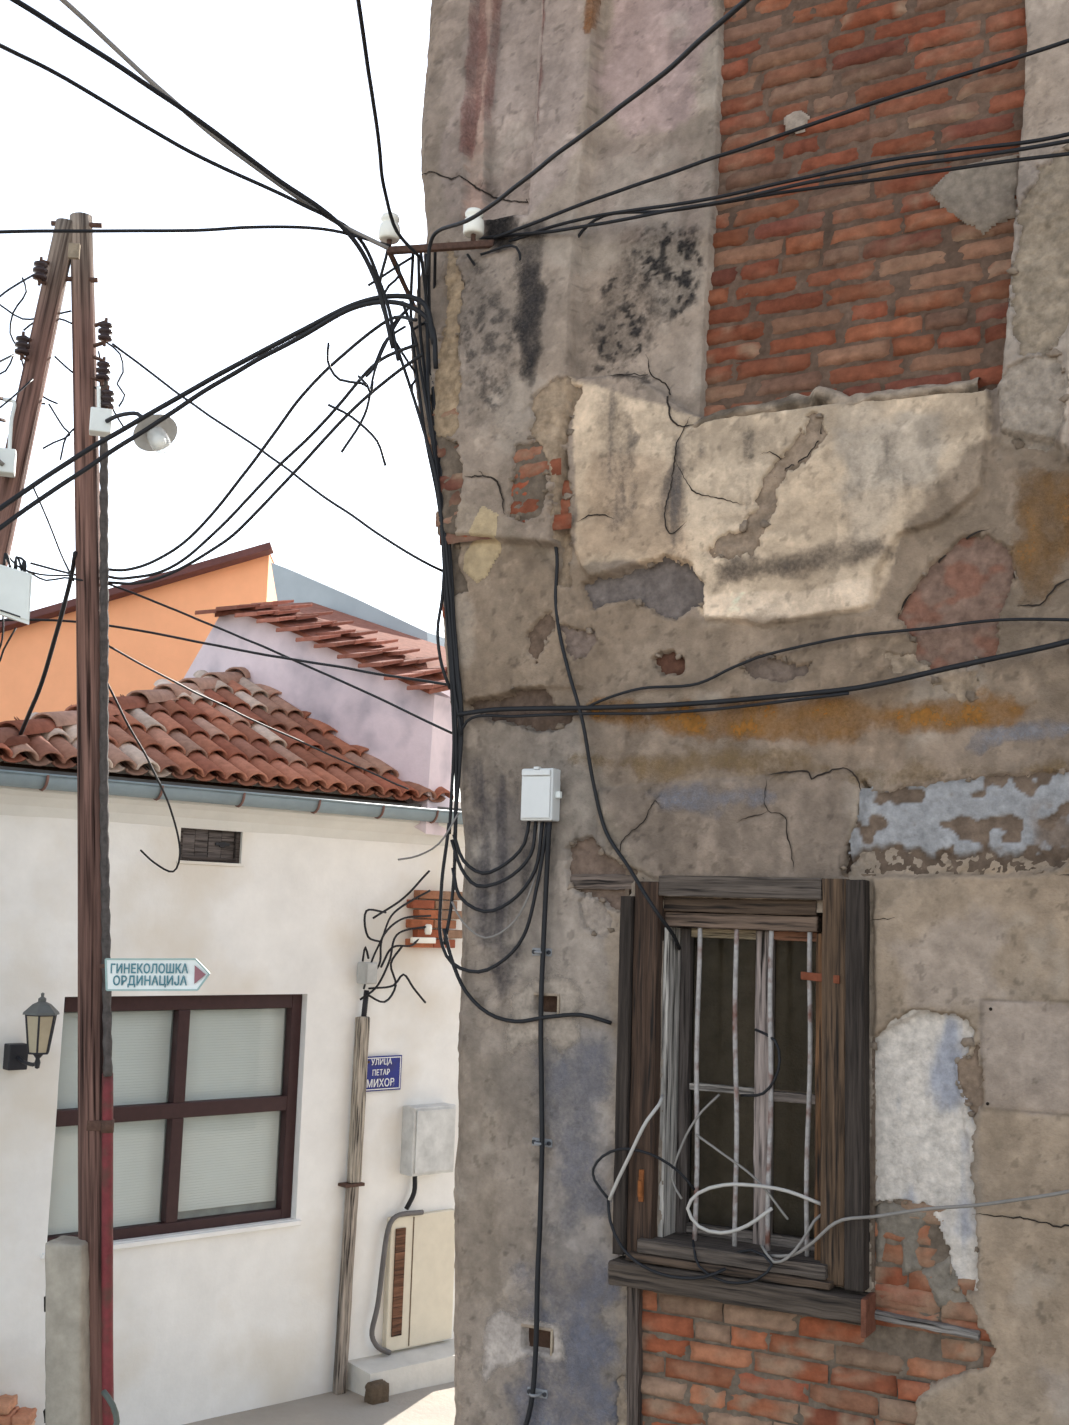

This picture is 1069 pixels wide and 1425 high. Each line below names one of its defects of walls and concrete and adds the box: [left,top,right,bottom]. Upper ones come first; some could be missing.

spalling [508,376,705,620]
crack [605,354,739,534]
crack [760,424,822,477]
spalling [528,614,597,664]
spalling [656,652,685,675]
spalling [882,535,1019,703]
crack [620,795,660,851]
crack [740,767,861,866]
peeling [840,768,1069,875]
flaking render [616,1010,996,1425]